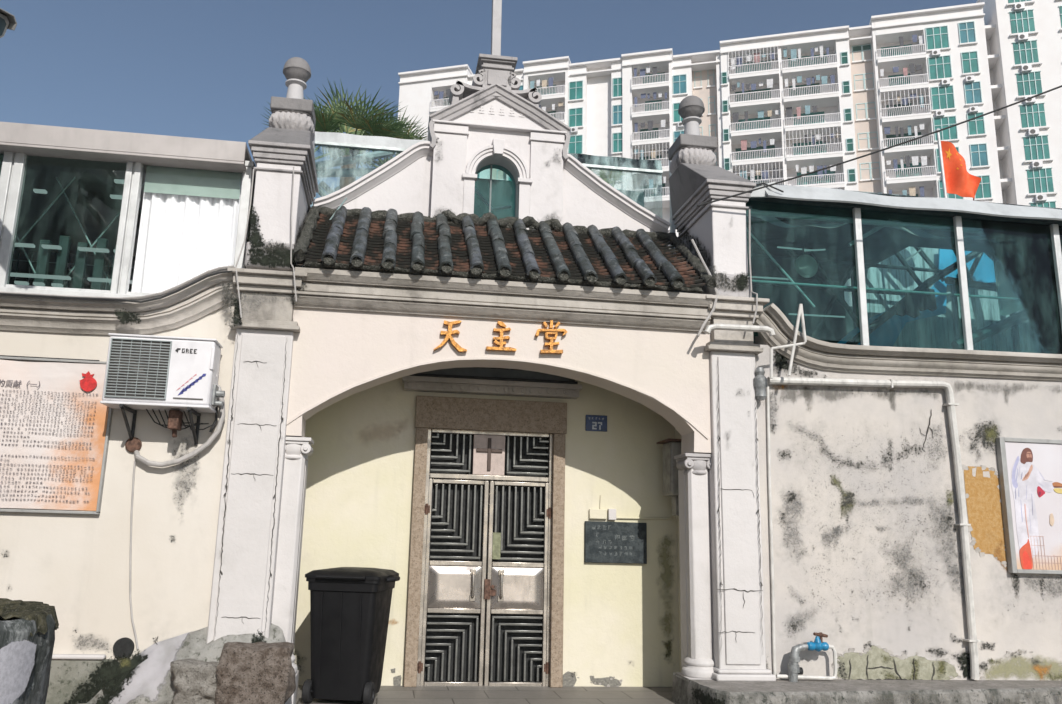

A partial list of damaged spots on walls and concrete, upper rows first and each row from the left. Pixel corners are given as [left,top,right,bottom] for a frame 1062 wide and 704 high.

leakage [173,440,199,505]
leakage [780,491,806,558]
leakage [795,427,947,550]
leakage [888,545,926,602]
crack [920,409,934,449]
leakage [895,490,964,594]
leakage [959,421,1001,461]
peeling [962,464,1008,571]
leakage [64,627,148,704]
peeling [832,645,961,680]
peeling [979,649,1062,681]